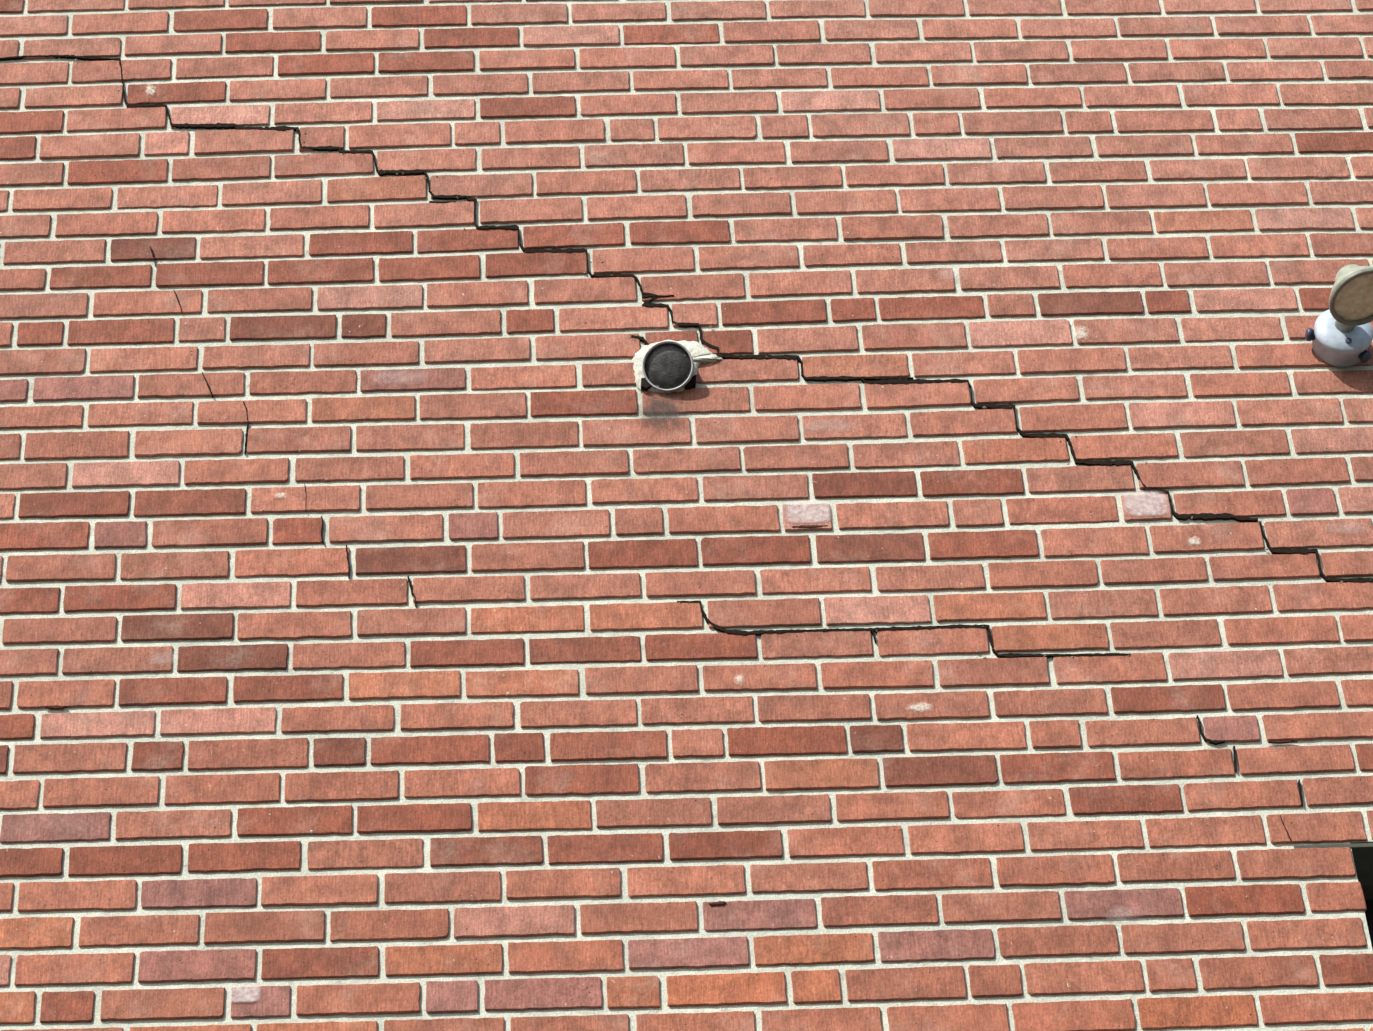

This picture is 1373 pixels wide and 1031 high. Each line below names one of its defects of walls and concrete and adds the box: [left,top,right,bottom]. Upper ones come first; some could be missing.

crack [0,55,1373,583]
crack [407,575,417,608]
crack [677,600,1130,659]